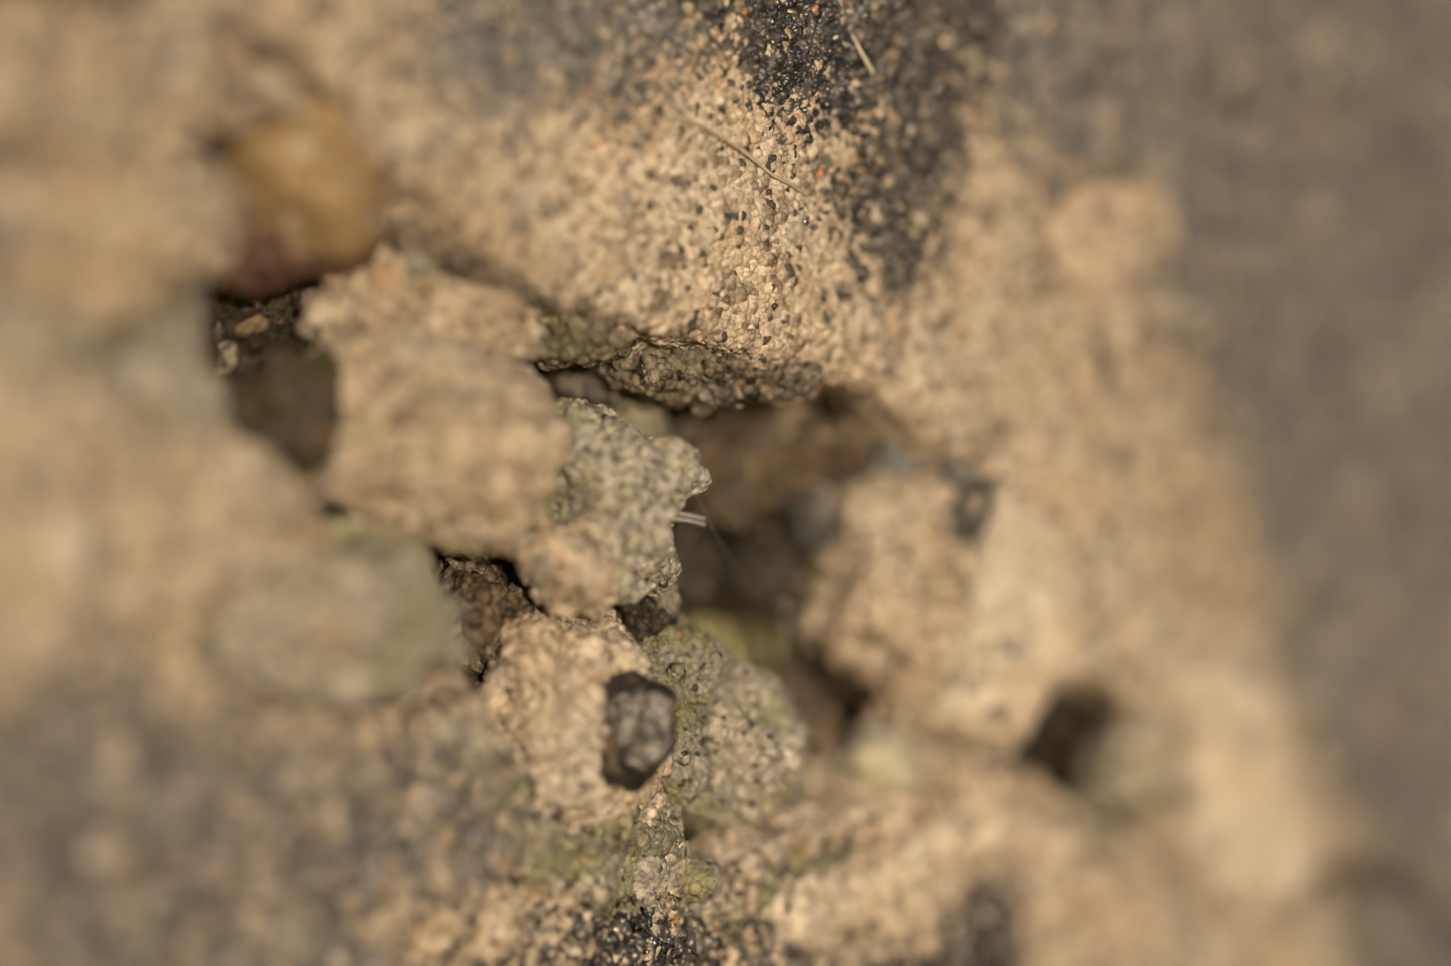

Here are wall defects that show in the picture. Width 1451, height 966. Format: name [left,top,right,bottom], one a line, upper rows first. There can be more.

spalling [203,277,323,382]
spalling [376,220,846,440]
spalling [489,553,524,584]
spalling [444,660,485,683]
spalling [679,555,869,744]
spalling [1005,689,1109,801]
spalling [683,830,698,844]